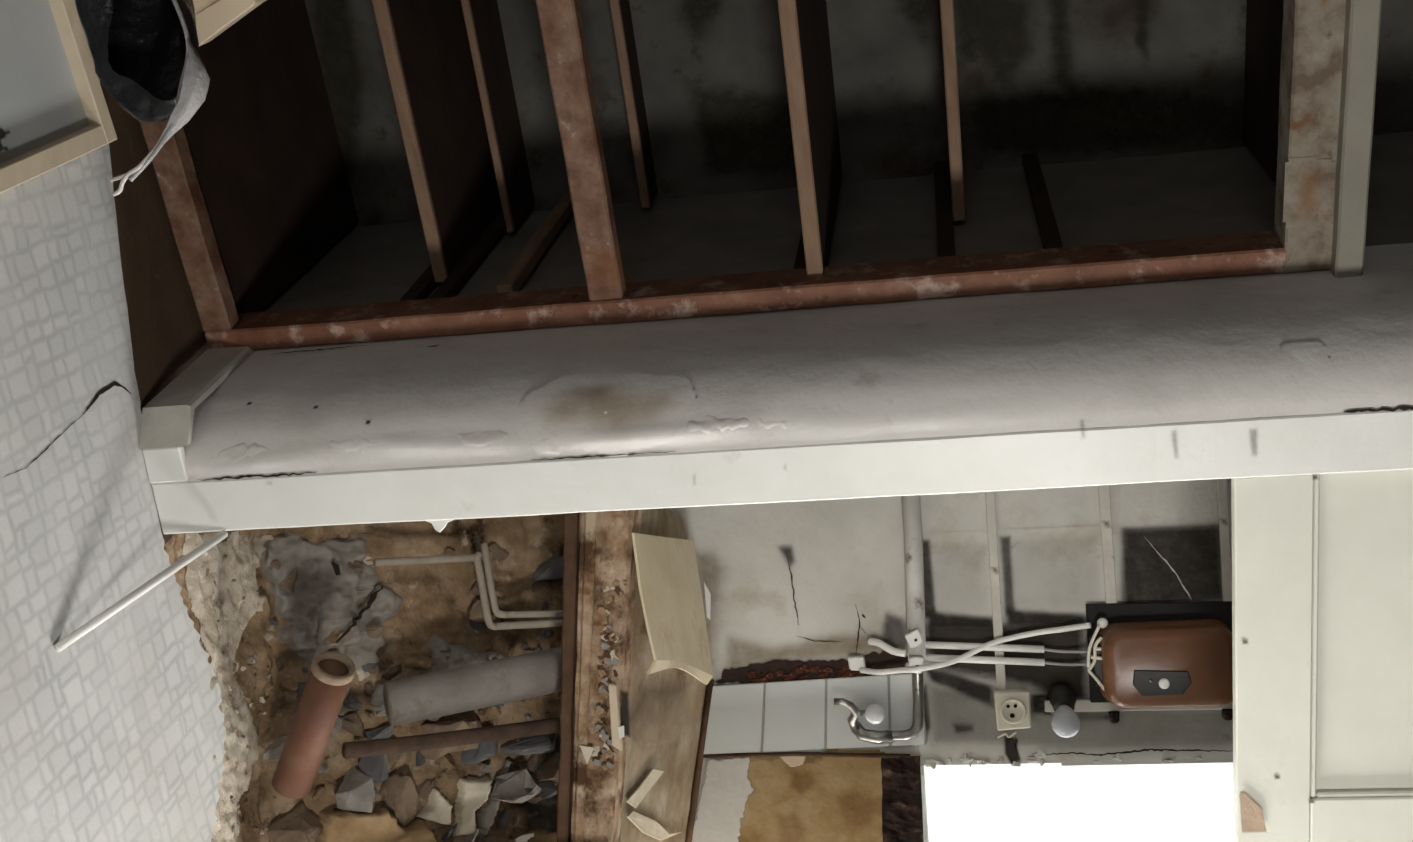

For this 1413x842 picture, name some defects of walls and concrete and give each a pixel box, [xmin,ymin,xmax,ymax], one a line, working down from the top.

corrosion [1283,156,1335,228]
leakage [519,368,699,457]
flaking render [356,667,370,681]
peeling [570,510,634,842]
flaking render [416,785,453,825]
flaking render [475,788,501,839]